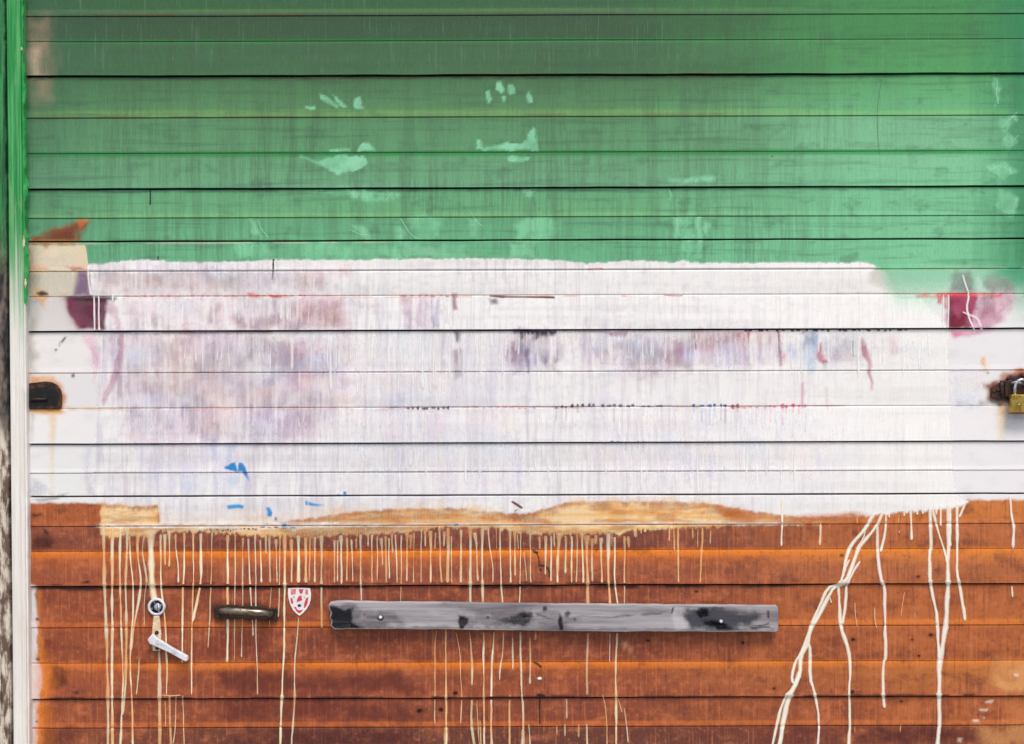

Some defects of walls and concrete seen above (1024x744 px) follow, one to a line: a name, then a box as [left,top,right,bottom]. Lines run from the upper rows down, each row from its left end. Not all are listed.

corrosion [32,221,85,241]
corrosion [987,369,1024,411]